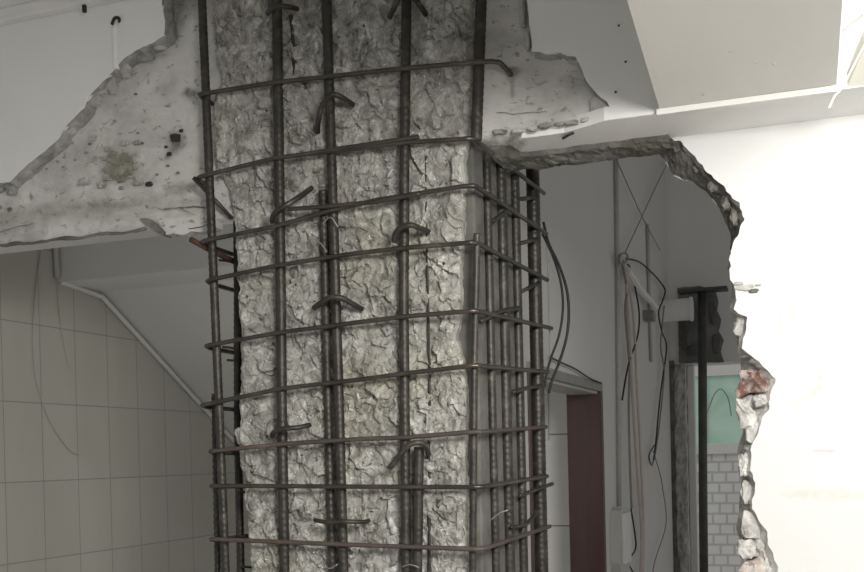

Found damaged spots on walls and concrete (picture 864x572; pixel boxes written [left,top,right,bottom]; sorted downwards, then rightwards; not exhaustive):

spalling [0,0,177,196]
spalling [145,129,183,187]
spalling [212,0,475,572]